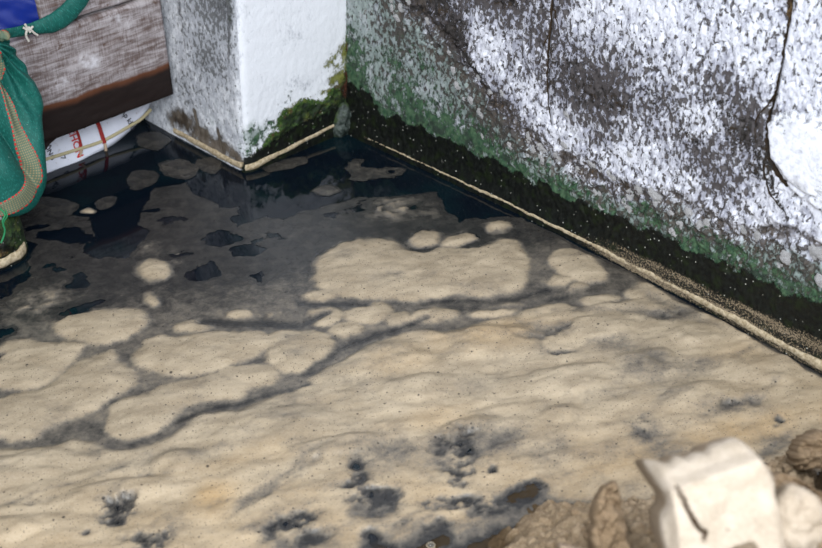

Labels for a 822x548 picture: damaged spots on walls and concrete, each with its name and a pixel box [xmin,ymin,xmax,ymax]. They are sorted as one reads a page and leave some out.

leakage [167,107,339,173]
crack [539,0,560,125]
leakage [544,35,665,125]
crack [754,0,796,208]
leakage [0,241,28,270]
leakage [346,82,822,374]